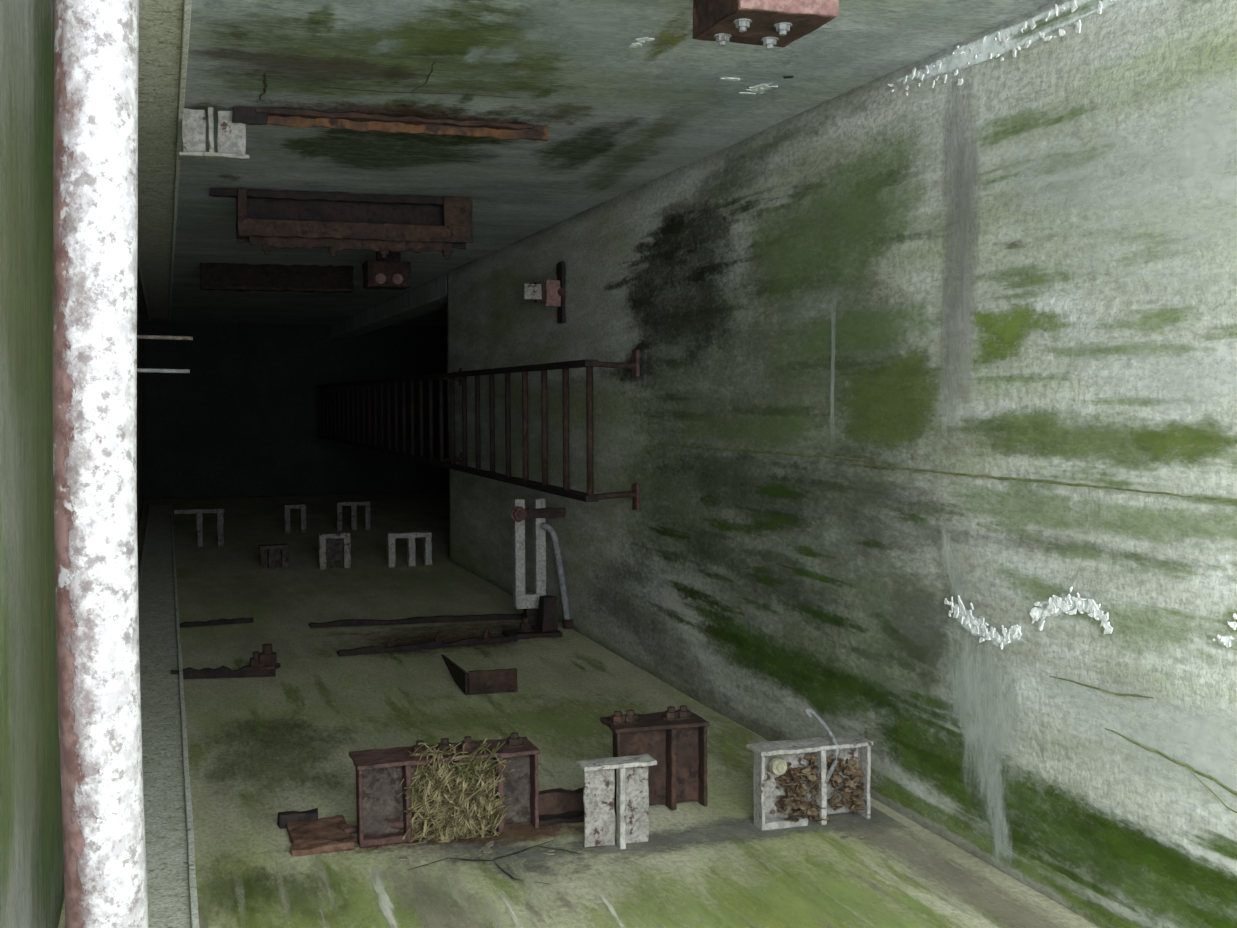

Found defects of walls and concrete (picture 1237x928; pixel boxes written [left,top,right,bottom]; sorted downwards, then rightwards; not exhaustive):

water stain [463,0,688,71]
water stain [700,0,983,118]
water stain [888,0,1122,99]
water stain [338,131,509,145]
water stain [791,641,1147,928]
water stain [198,909,207,928]
water stain [373,863,551,928]
water stain [1068,814,1237,902]